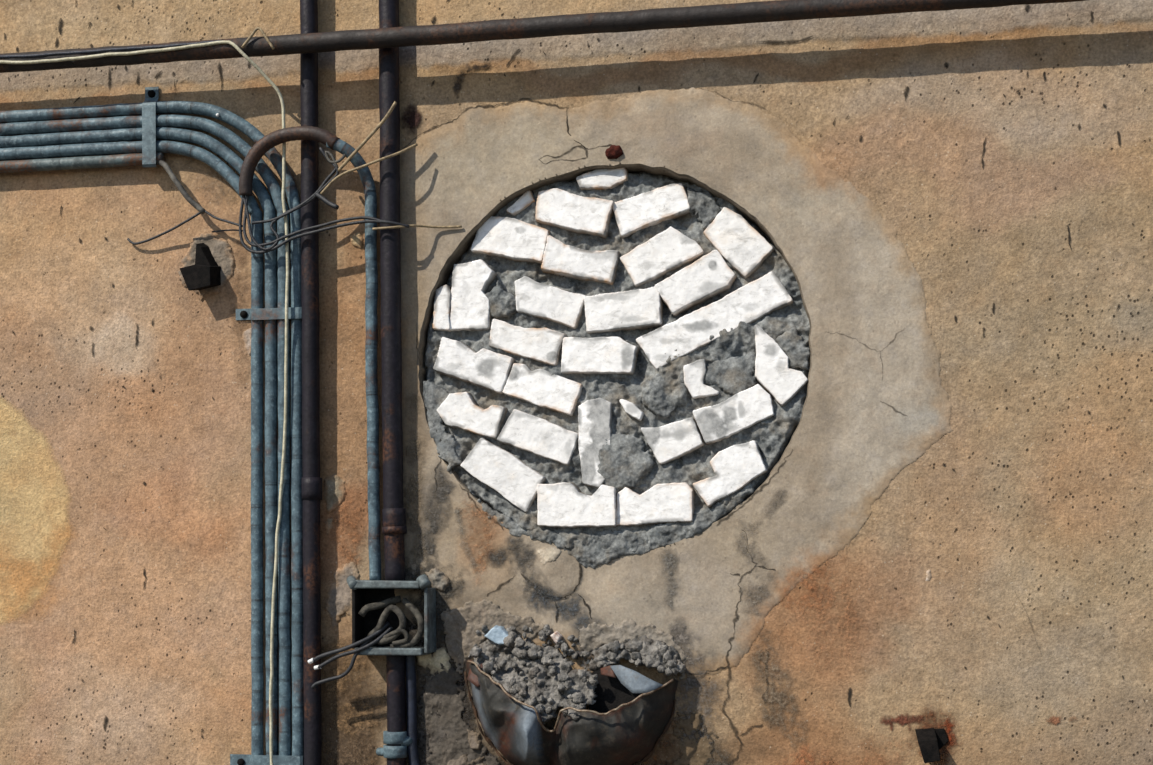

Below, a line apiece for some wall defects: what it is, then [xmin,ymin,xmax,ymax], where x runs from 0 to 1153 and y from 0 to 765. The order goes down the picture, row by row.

crack [404,98,612,164]
leakage [404,431,475,765]
spalling [416,599,546,765]
leakage [489,538,599,667]
peeling [537,545,562,565]
spalling [575,619,689,680]
spalling [673,712,719,765]
leakage [670,623,728,765]
crack [687,449,793,765]
corrosion [881,711,957,765]